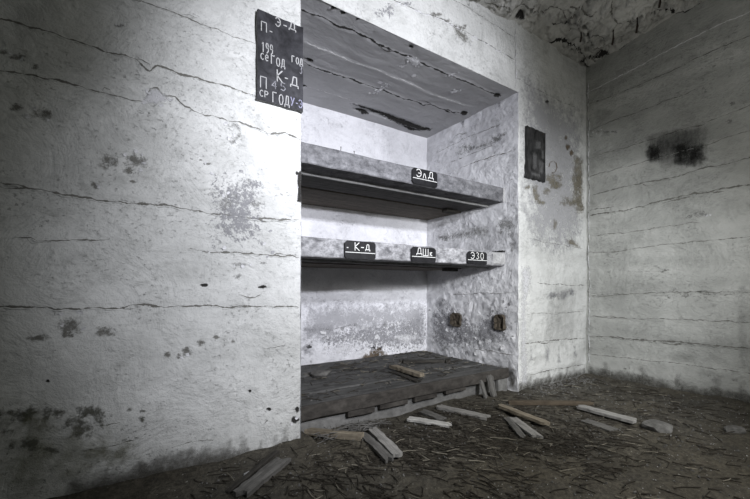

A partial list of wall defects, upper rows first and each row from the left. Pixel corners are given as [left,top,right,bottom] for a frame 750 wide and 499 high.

crack [132,0,256,45]
crack [301,9,494,94]
crack [0,18,300,141]
crack [303,41,462,113]
leakage [648,146,659,161]
leakage [675,145,702,164]
crack [0,182,298,222]
crack [393,0,750,376]
crack [0,294,298,315]
leakage [0,406,104,438]